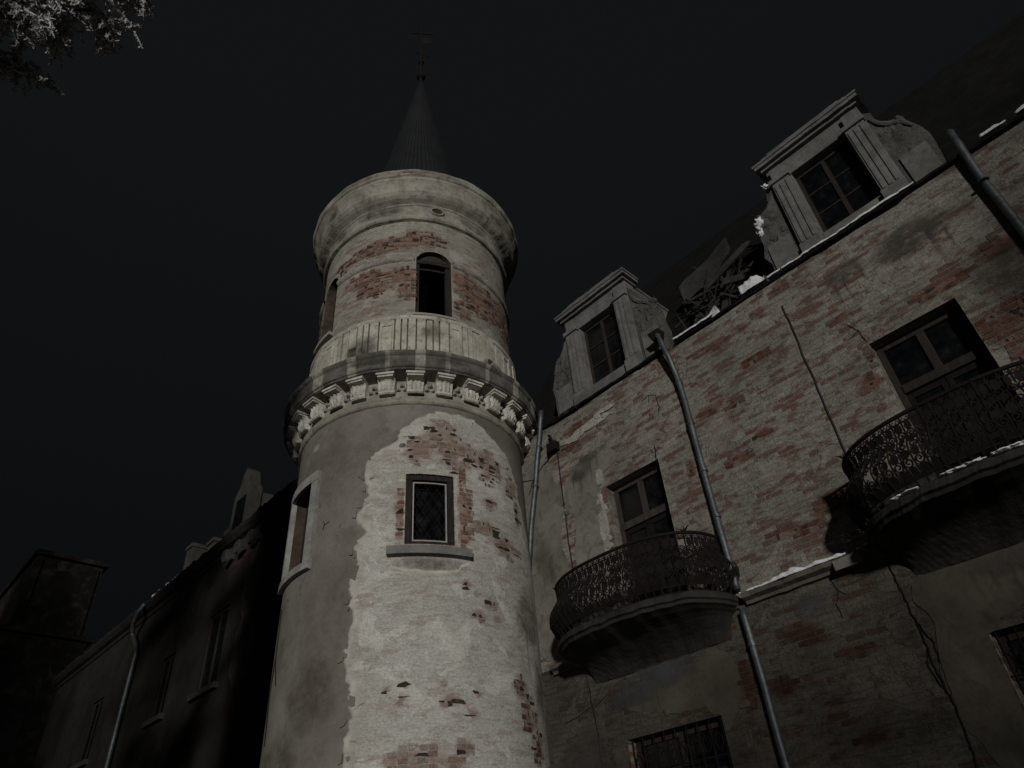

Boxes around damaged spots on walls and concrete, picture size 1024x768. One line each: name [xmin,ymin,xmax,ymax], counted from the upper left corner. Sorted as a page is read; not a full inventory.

spalling [336,230,447,300]
spalling [453,272,509,341]
peeling [335,403,618,768]
crack [888,561,979,768]